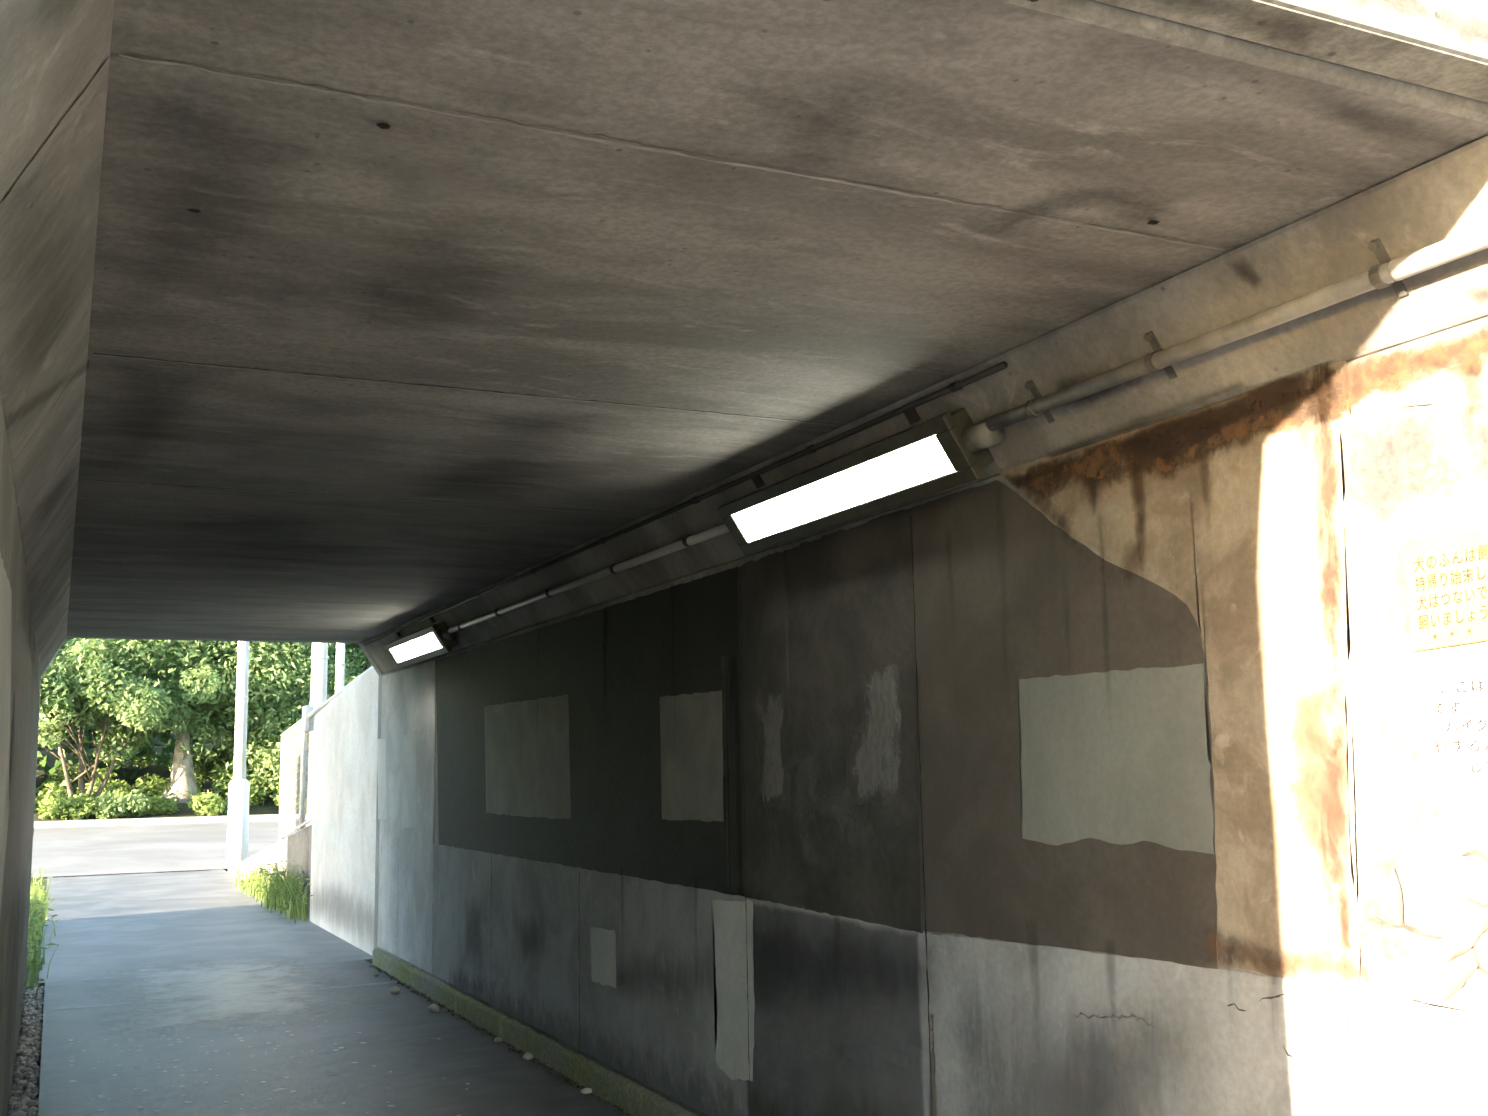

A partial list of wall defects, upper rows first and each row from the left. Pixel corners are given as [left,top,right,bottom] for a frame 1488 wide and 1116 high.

corrosion [1012,328,1488,654]
corrosion [1207,690,1357,976]
crack [1367,868,1488,1001]
crack [1462,848,1488,863]